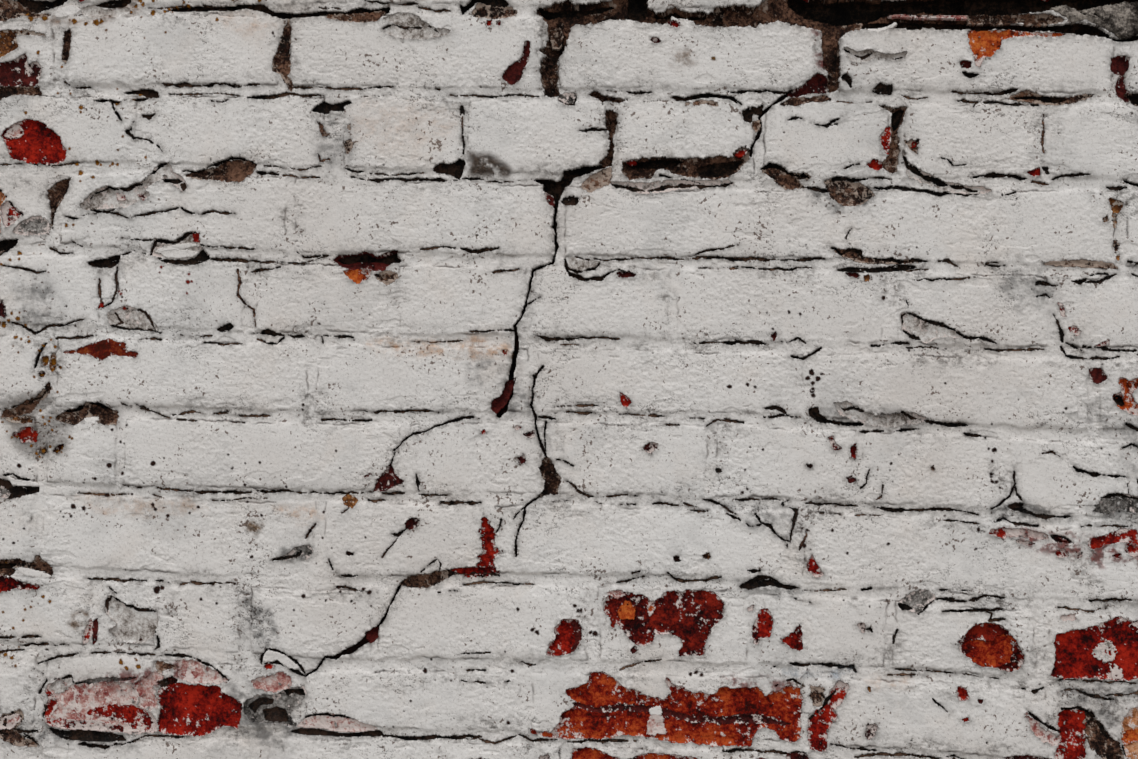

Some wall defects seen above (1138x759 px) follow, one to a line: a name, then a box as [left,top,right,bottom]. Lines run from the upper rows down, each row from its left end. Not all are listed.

peeling [502,0,1138,106]
crack [64,81,394,152]
spalling [760,83,1094,206]
crack [3,207,235,274]
crack [9,319,97,340]
crack [77,88,1138,677]
crack [0,635,155,674]
peeling [0,595,482,749]
peeling [603,589,724,656]
crack [887,629,999,713]
peeling [1021,614,1138,694]
peeling [530,671,849,759]